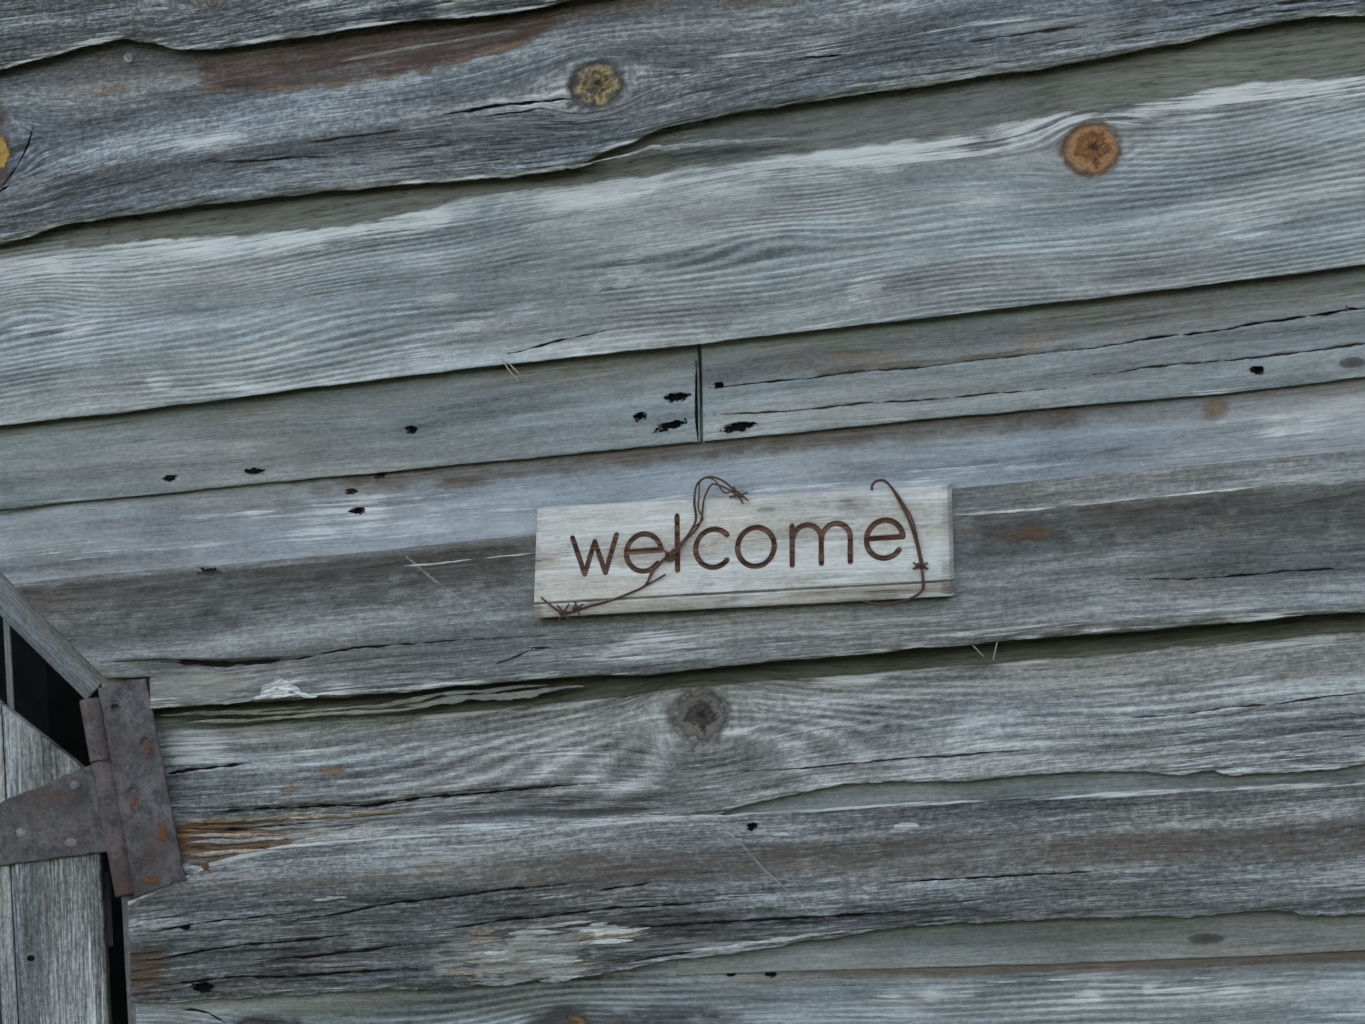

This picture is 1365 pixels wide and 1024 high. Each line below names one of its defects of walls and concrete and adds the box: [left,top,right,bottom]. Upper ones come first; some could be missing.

crack [0,128,33,192]
crack [703,307,1365,416]
crack [139,869,1114,1023]